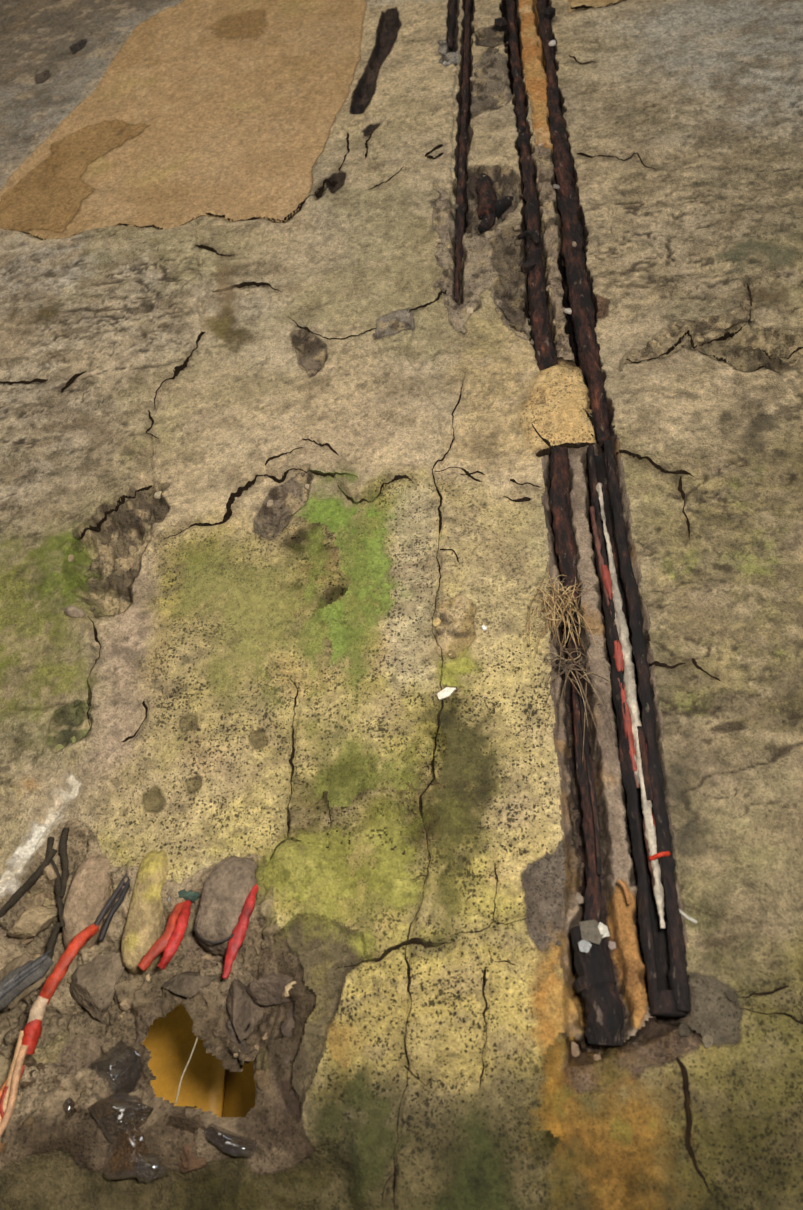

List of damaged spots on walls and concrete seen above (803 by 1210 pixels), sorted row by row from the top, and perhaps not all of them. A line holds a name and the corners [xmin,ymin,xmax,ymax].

peeling [0,0,402,240]
spalling [430,0,579,368]
crack [571,0,626,9]
crack [146,332,205,439]
spalling [619,298,803,373]
spalling [62,482,170,618]
crack [167,377,694,1209]
spalling [0,819,367,1183]
rust [535,942,662,1210]